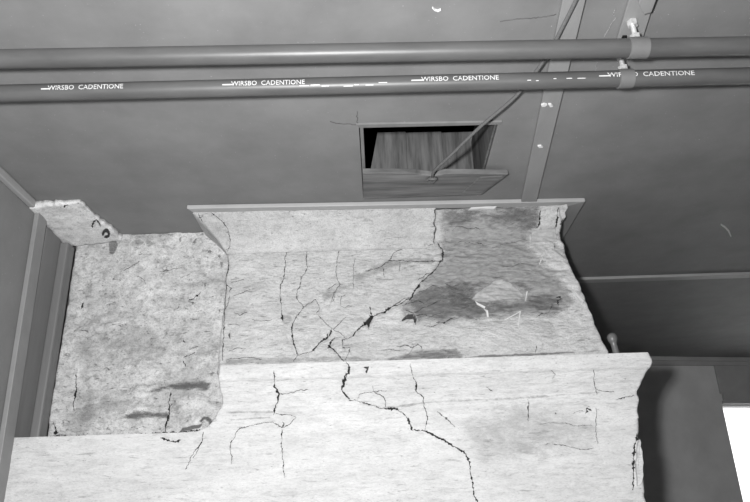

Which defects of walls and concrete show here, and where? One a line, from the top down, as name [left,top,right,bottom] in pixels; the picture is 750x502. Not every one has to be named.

water stain [448,282,559,313]
crack [199,208,562,502]
water stain [151,382,210,392]
water stain [181,417,212,432]
crack [527,370,634,450]
crack [631,434,639,490]